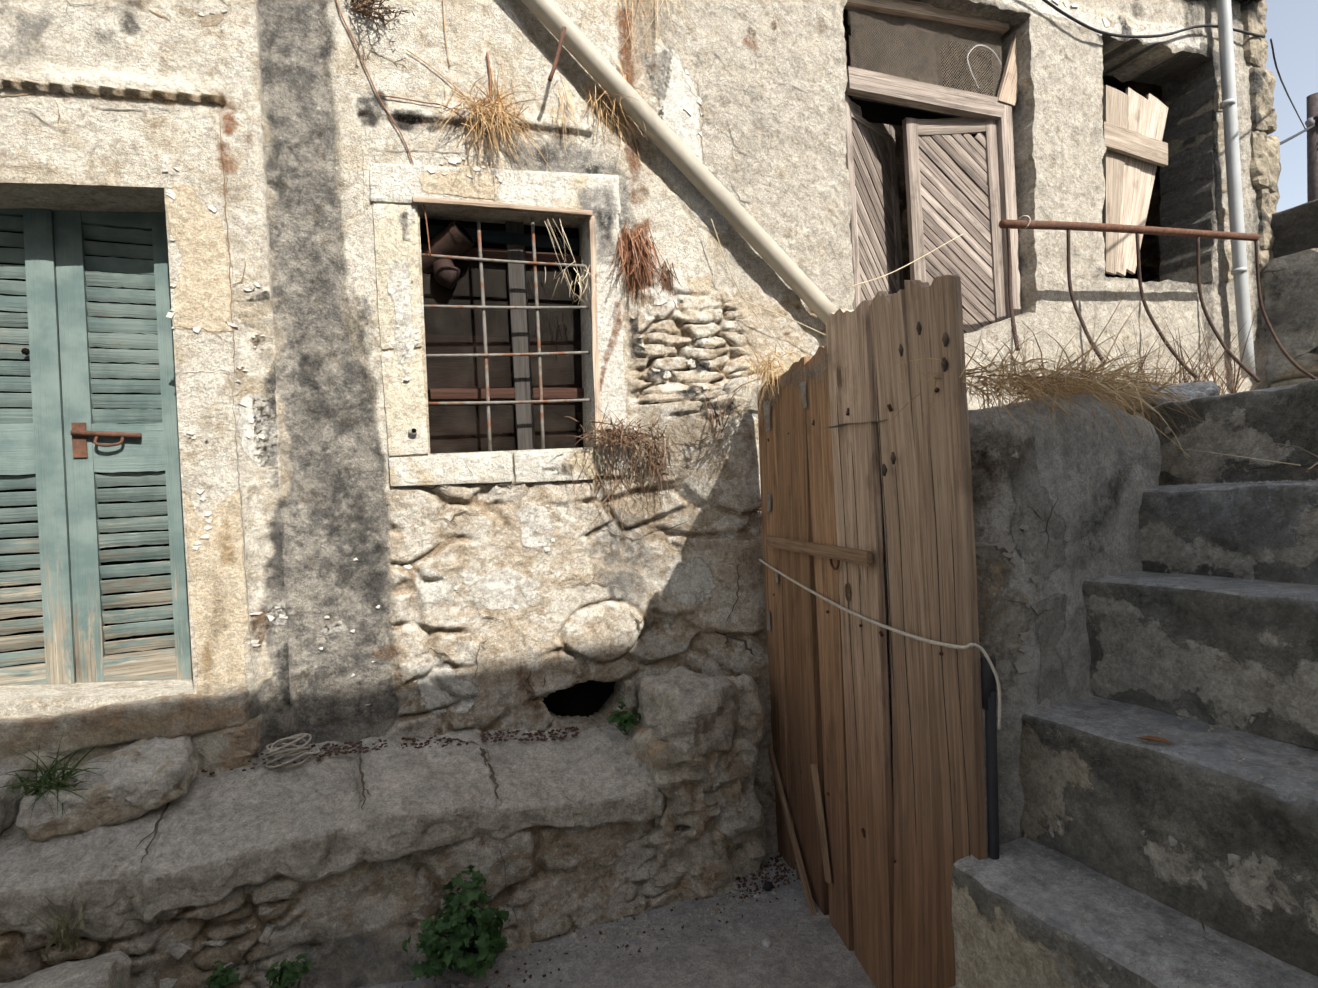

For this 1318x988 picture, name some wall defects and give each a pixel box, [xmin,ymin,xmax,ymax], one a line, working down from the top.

spalling [630,315,646,355]
leakage [266,368,276,414]
spalling [647,367,671,379]
spalling [680,358,735,416]
leakage [342,546,383,604]
leakage [278,644,290,704]